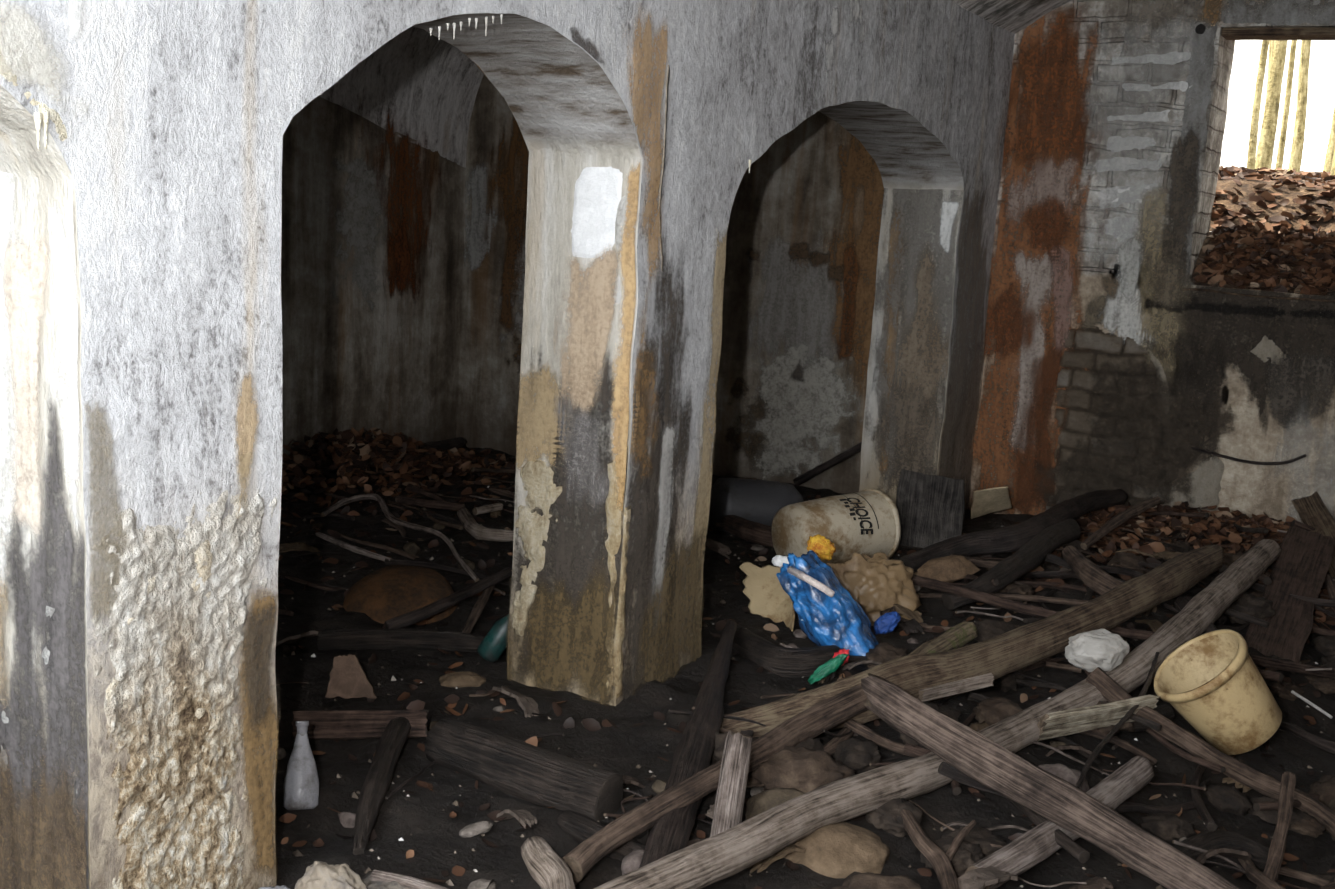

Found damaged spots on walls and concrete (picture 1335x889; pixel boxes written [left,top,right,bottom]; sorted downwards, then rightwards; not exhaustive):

efflorescence [0,5,67,151]
corrosion [367,111,440,299]
corrosion [484,116,529,336]
corrosion [612,16,667,511]
corrosion [823,134,899,394]
corrosion [968,8,1109,515]
spalling [1036,276,1234,512]
water stain [1102,130,1335,458]
water stain [0,172,123,889]
peeling [511,458,562,637]
water stain [240,590,278,874]